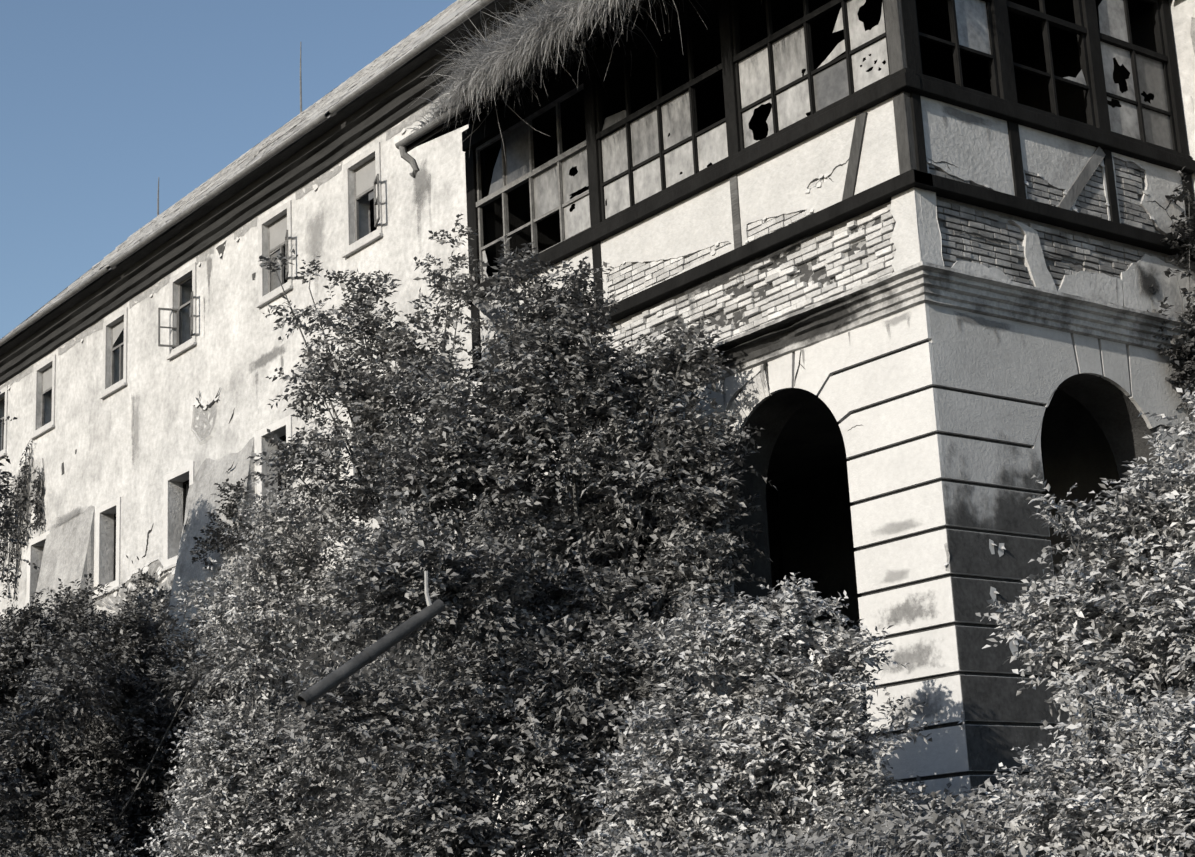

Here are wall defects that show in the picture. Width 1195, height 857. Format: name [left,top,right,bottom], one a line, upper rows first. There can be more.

peeling [1024,158,1162,234]
peeling [607,208,814,303]
spalling [848,217,881,257]
spalling [653,243,838,335]
water stain [888,599,933,624]
water stain [889,645,930,670]
water stain [899,692,937,717]